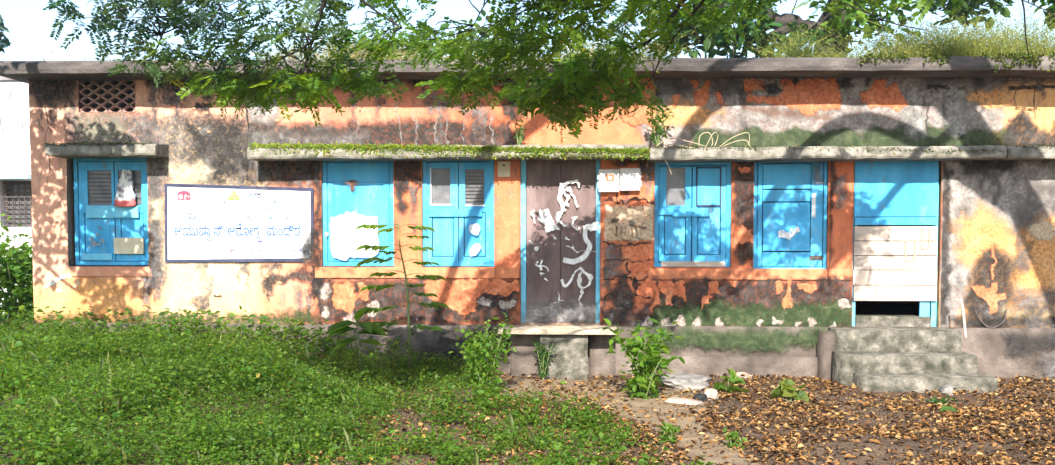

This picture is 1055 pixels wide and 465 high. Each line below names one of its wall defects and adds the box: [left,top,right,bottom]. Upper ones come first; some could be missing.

peeling [627,78,1055,148]
leakage [0,79,542,319]
peeling [262,268,520,325]
peeling [554,172,853,327]
peeling [939,160,1055,328]
leakage [941,160,1055,378]